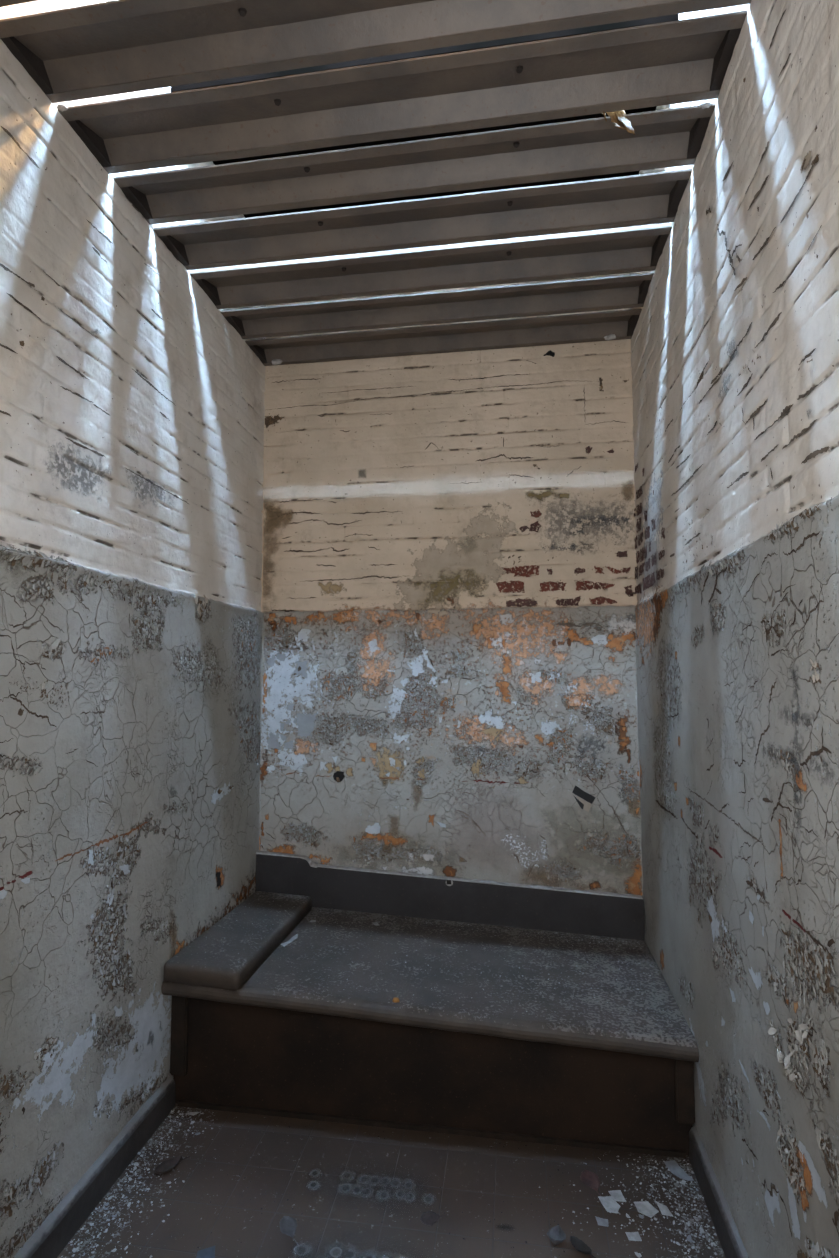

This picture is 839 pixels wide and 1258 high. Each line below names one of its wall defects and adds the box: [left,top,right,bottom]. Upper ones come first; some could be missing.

crack [0,588,141,780]
leakage [263,503,292,596]
leakage [407,570,487,608]
crack [656,532,832,902]
crack [0,788,149,867]
peeling [0,464,839,1258]